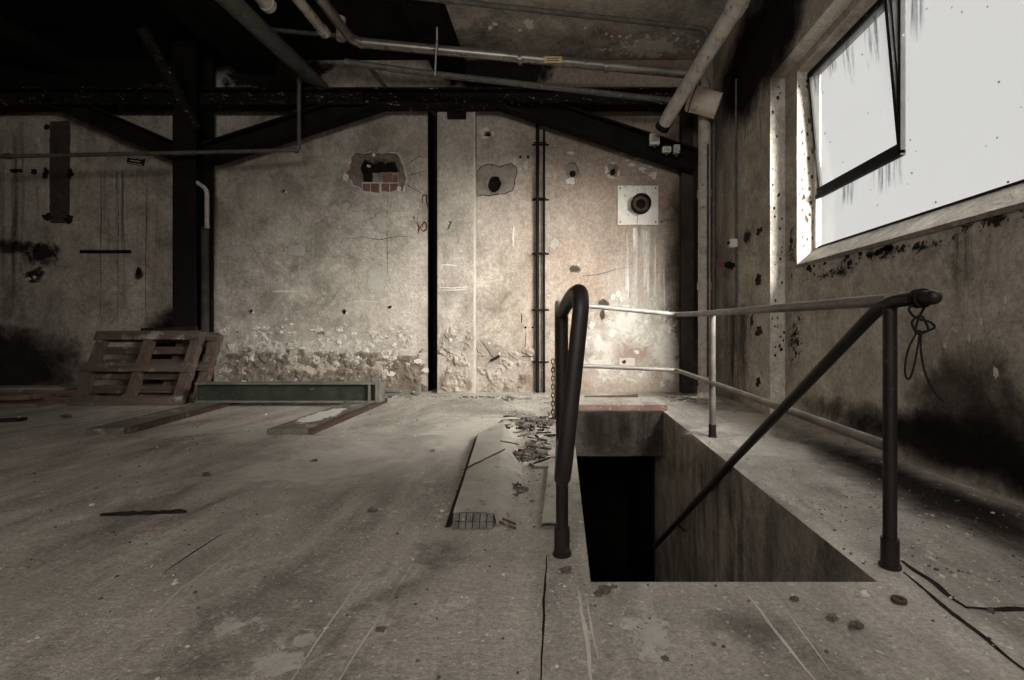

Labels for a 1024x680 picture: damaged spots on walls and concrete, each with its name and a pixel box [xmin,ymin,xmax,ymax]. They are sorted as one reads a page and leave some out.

flaking render [343,151,424,194]
leakage [0,195,61,283]
leakage [788,214,1009,283]
leakage [584,202,679,388]
flaking render [219,311,429,391]
flaking render [438,326,535,392]
leakage [787,313,804,366]
leakage [821,402,882,438]
leakage [898,359,1024,496]
crack [539,556,547,680]